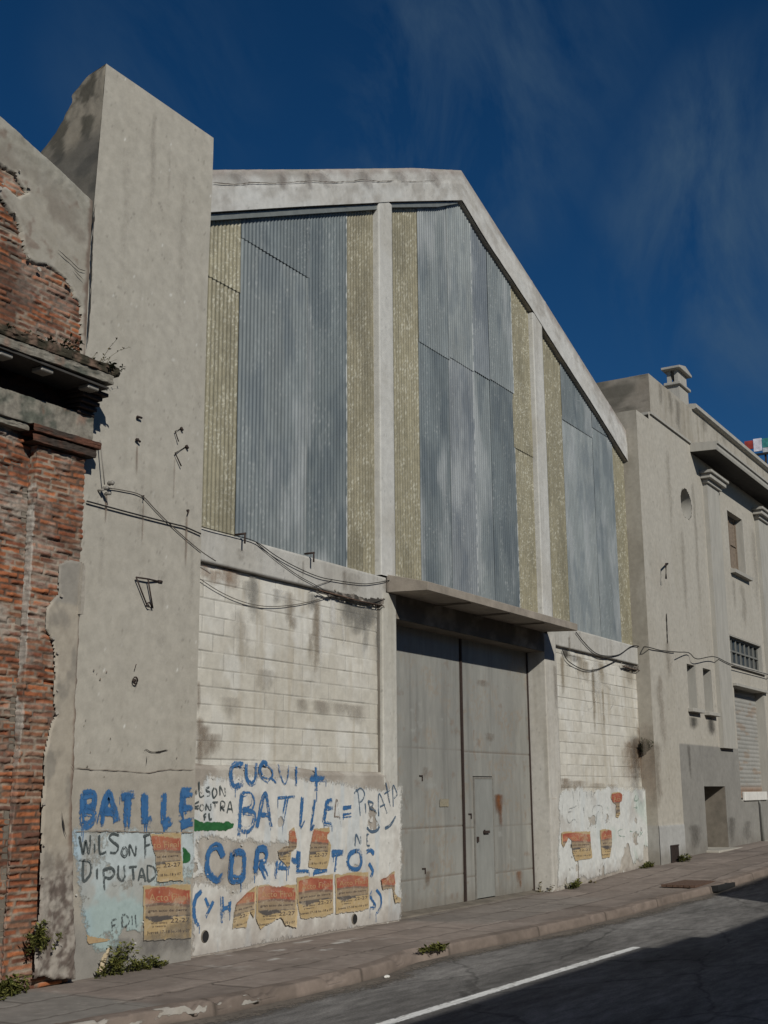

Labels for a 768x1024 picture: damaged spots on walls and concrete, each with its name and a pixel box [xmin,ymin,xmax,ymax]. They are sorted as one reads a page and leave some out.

flaking render [0,168,82,351]
leakage [311,596,380,655]